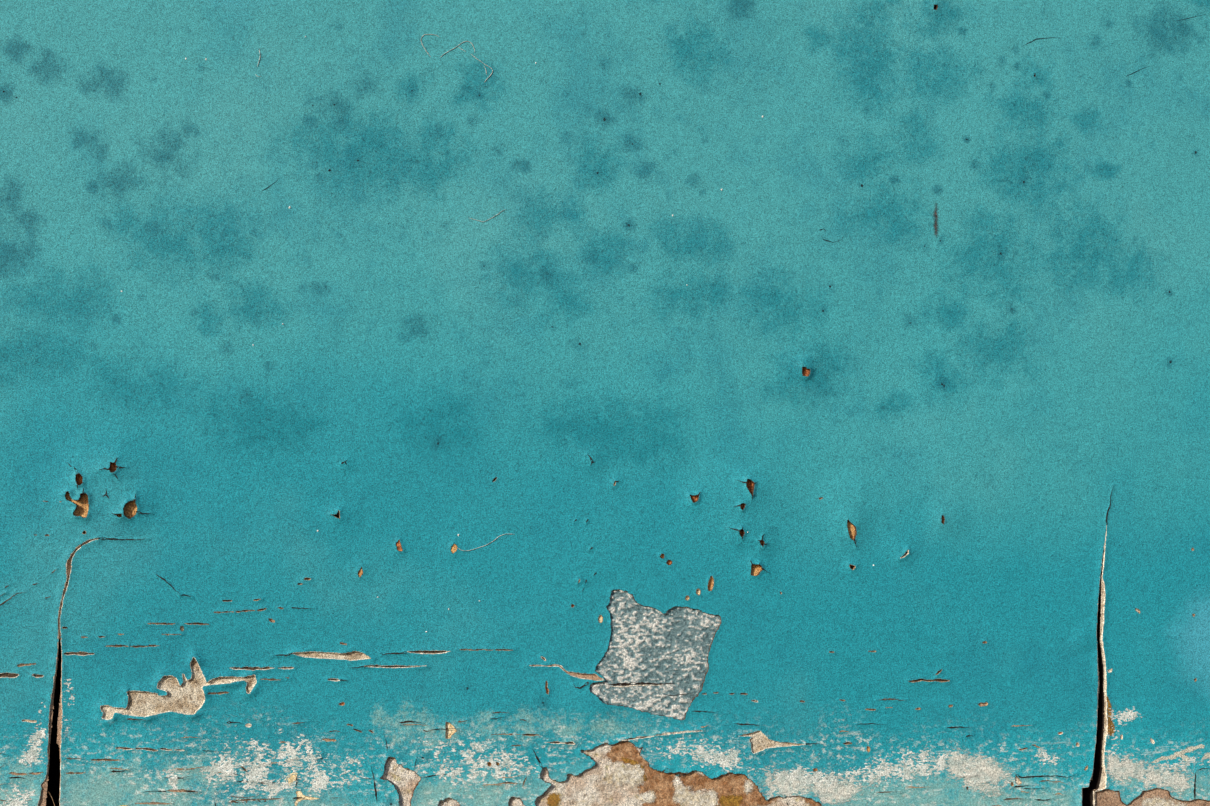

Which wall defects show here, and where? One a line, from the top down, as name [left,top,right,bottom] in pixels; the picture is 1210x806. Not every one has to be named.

water stain [270,56,510,211]
water stain [800,0,1165,425]
crack [0,491,314,806]
peeling [94,651,262,725]
peeling [525,574,723,723]
crack [1078,489,1113,806]
water stain [64,727,382,806]
peeling [375,754,424,806]
peeling [486,727,829,806]
water stain [368,700,1086,806]
peeling [1094,785,1210,806]
water stain [1105,706,1210,802]